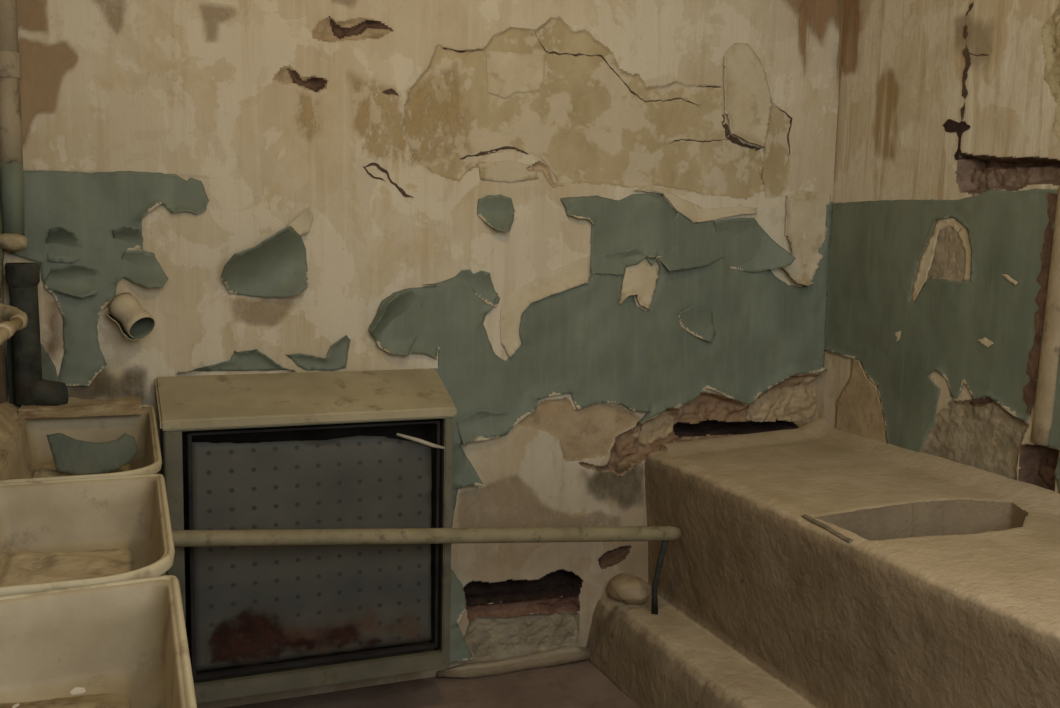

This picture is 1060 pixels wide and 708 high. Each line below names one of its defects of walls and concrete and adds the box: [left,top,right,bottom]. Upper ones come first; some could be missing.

spalling [312,16,393,42]
crack [382,88,399,96]
crack [943,1,988,160]
crack [364,163,414,198]
peeling [9,170,209,387]
peeling [221,206,314,298]
peeling [368,1,1060,525]
peeling [46,433,138,475]
spalling [597,546,631,569]
spalling [450,569,584,664]